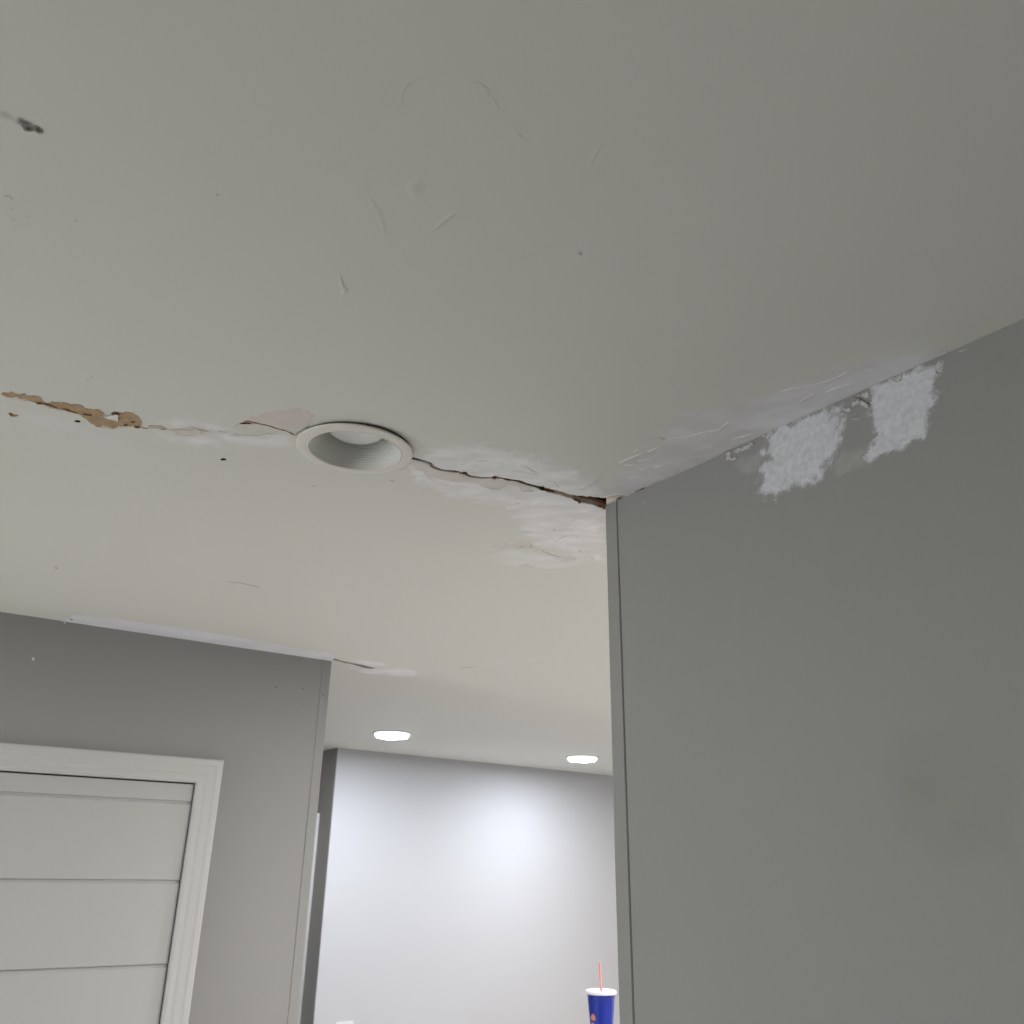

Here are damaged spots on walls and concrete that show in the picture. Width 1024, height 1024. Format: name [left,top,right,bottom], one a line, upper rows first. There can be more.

peeling [1,392,150,431]
crack [412,457,622,509]